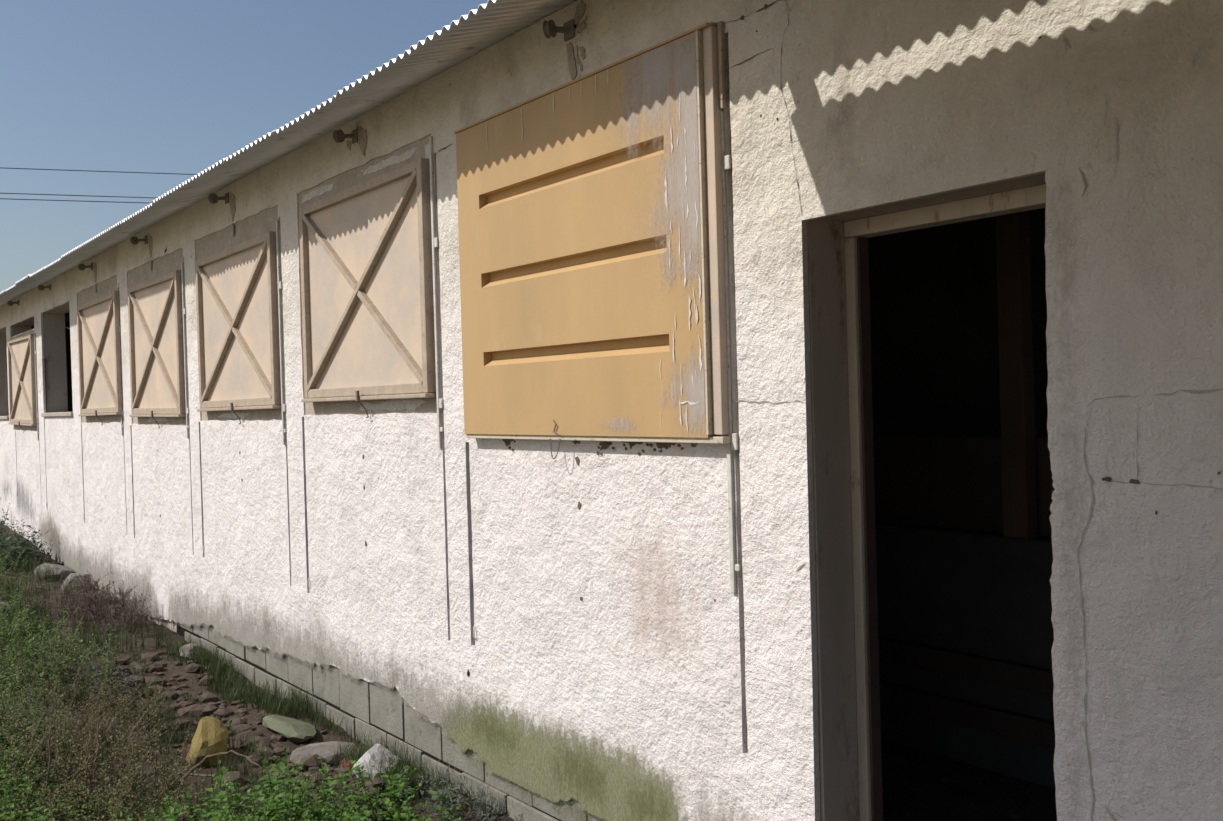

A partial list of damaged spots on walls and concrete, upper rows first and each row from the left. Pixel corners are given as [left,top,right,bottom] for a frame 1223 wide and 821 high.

crack [725,0,789,67]
peeling [597,32,705,455]
crack [1079,169,1087,197]
water stain [40,520,514,746]
crack [1077,389,1223,821]